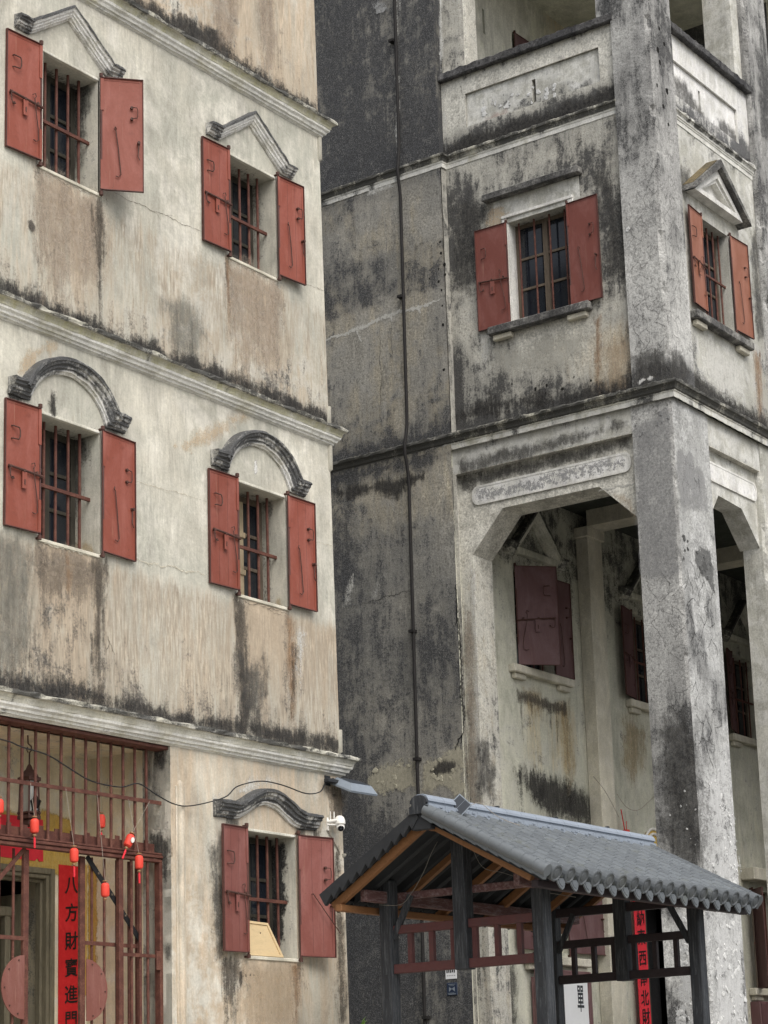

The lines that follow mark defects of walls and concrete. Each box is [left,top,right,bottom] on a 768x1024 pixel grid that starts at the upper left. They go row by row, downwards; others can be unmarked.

water stain [443,86,615,154]
water stain [0,277,113,334]
water stain [131,304,327,422]
peeling [474,458,624,502]
water stain [0,537,343,753]
water stain [517,767,591,824]